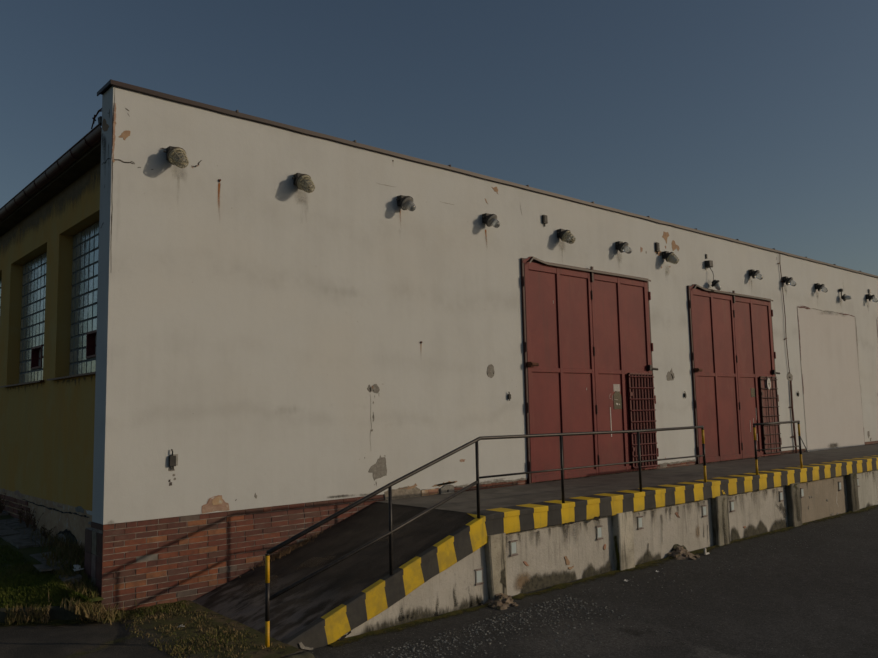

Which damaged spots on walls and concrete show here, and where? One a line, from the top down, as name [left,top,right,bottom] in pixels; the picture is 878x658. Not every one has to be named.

flaking render [102,103,131,162]
crack [103,152,154,184]
peeling [640,231,680,268]
flaking render [202,495,230,513]
water stain [731,489,788,541]
water stain [638,544,661,564]
water stain [517,561,611,593]
water stain [364,591,483,633]